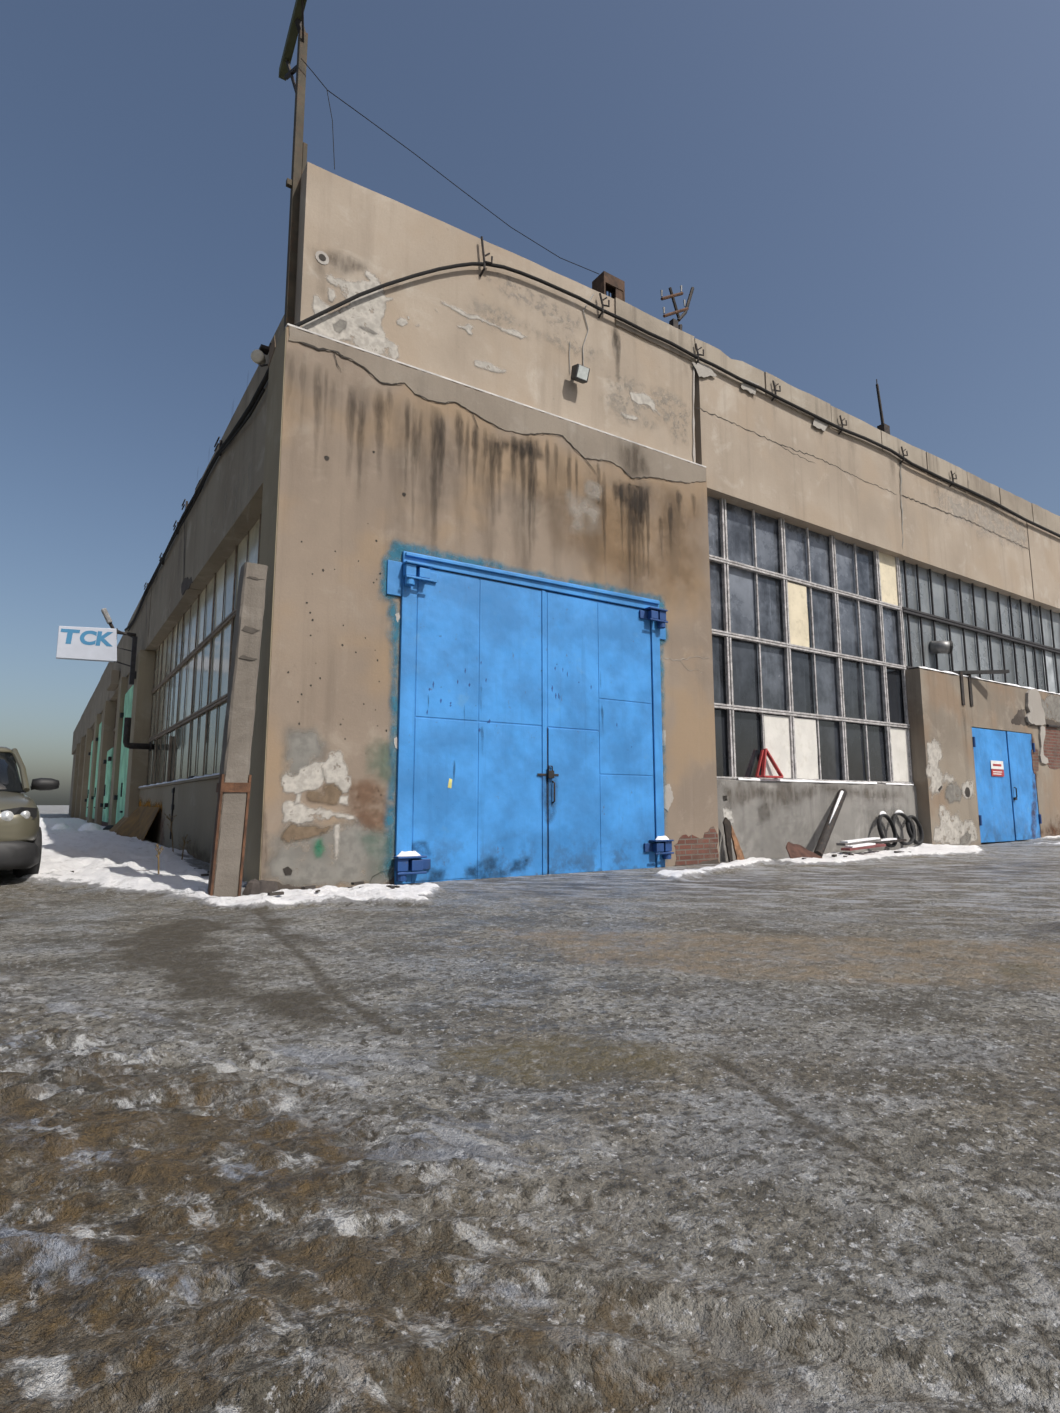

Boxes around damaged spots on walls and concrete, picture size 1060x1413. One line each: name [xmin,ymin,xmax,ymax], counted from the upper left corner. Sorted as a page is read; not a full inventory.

spalling [268,271,706,483]
crack [299,341,685,483]
water stain [493,441,540,465]
water stain [619,450,647,531]
flaking render [1011,694,1060,774]
spalling [268,722,395,890]
spalling [674,808,734,866]
peeling [926,739,977,845]